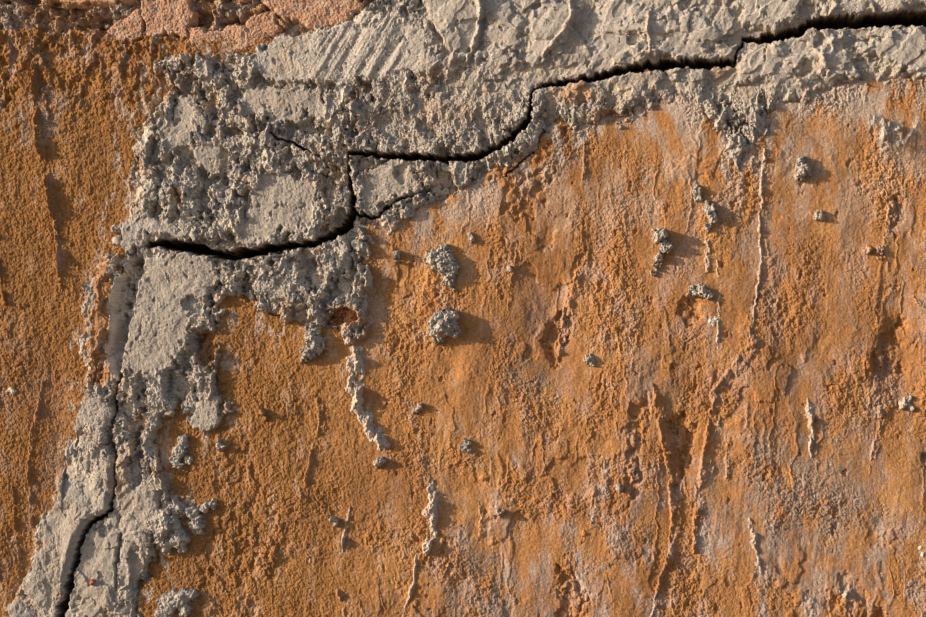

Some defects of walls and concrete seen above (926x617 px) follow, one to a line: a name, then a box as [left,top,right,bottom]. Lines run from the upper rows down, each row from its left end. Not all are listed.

crack [144,8,926,262]
crack [55,372,124,617]